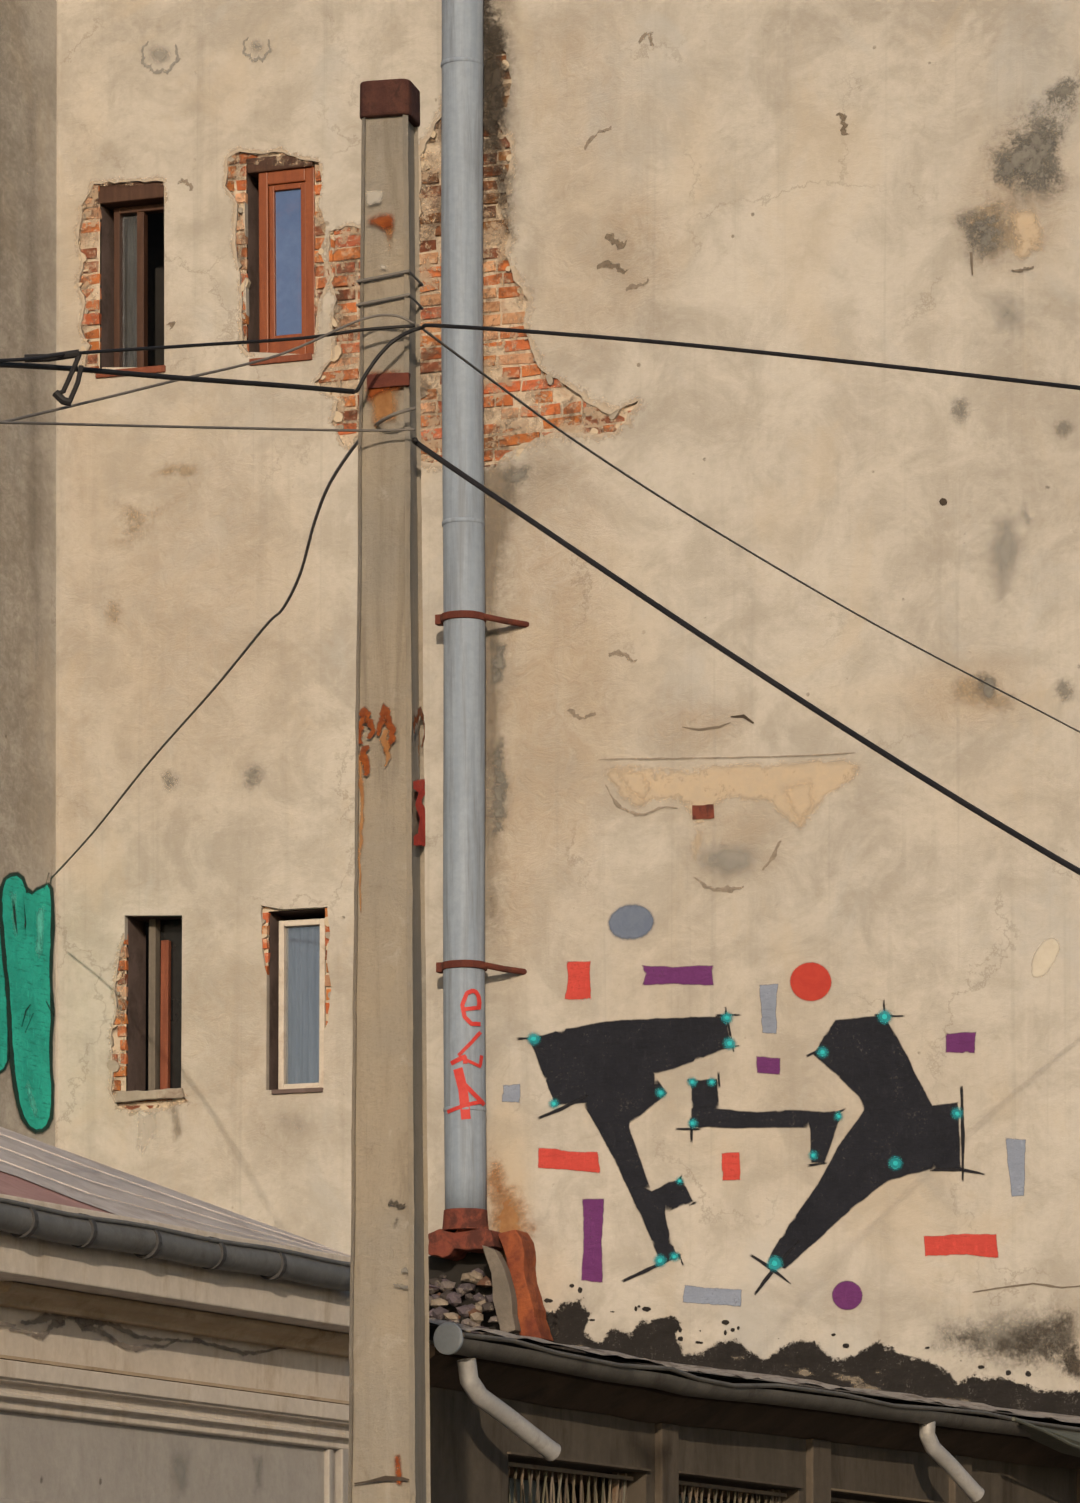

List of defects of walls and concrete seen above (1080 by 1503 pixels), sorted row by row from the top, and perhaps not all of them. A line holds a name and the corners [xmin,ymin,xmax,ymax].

spalling [74,177,167,369]
spalling [223,147,361,450]
spalling [418,105,442,468]
spalling [483,49,640,473]
rust [358,703,425,911]
peeling [600,752,858,848]
spalling [107,934,189,1116]
spalling [261,906,331,1025]
rust [488,1169,533,1233]
leakage [958,1316,1080,1376]